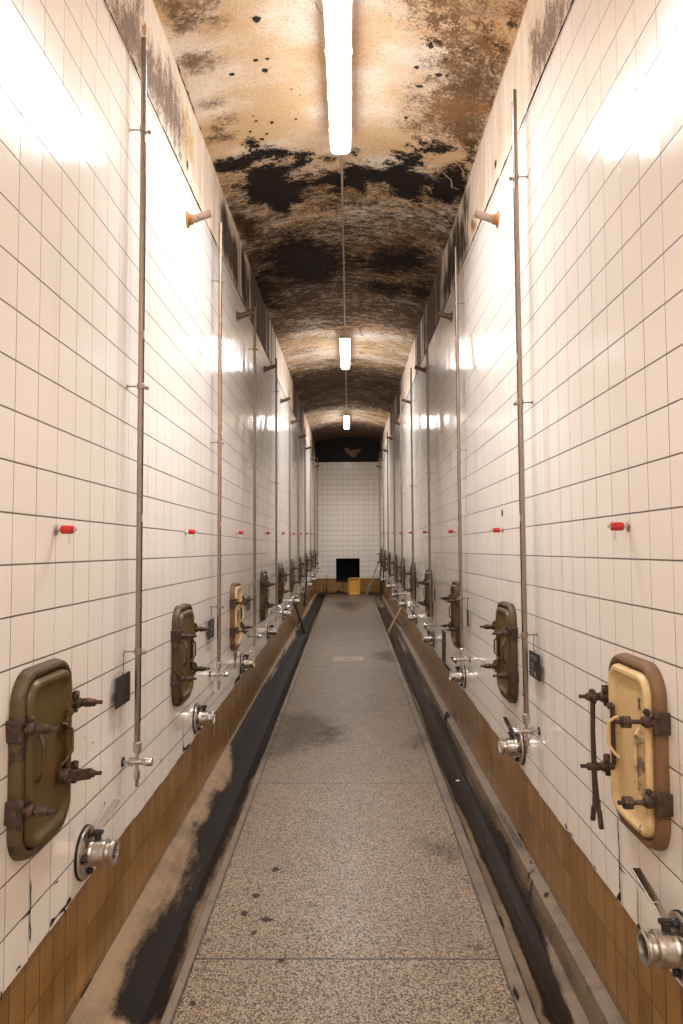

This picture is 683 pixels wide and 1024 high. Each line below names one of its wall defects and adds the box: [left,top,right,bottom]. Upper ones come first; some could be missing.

water stain [108,0,227,159]
water stain [207,0,527,310]
water stain [528,0,572,87]
crack [23,883,32,941]